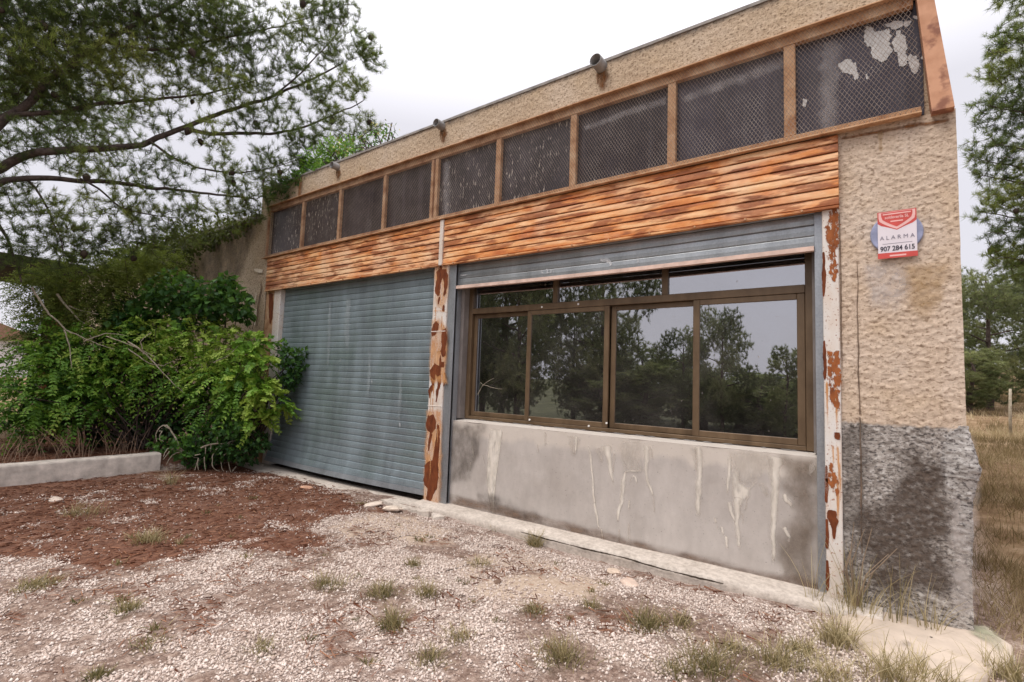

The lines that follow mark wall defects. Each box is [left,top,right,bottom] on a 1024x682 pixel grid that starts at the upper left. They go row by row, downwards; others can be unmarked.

peeling [838,59,869,80]
peeling [864,15,923,73]
corrosion [822,208,841,297]
corrosion [423,266,448,501]
corrosion [823,340,842,413]
water stain [573,436,654,537]
corrosion [825,432,841,591]
water stain [847,456,965,596]